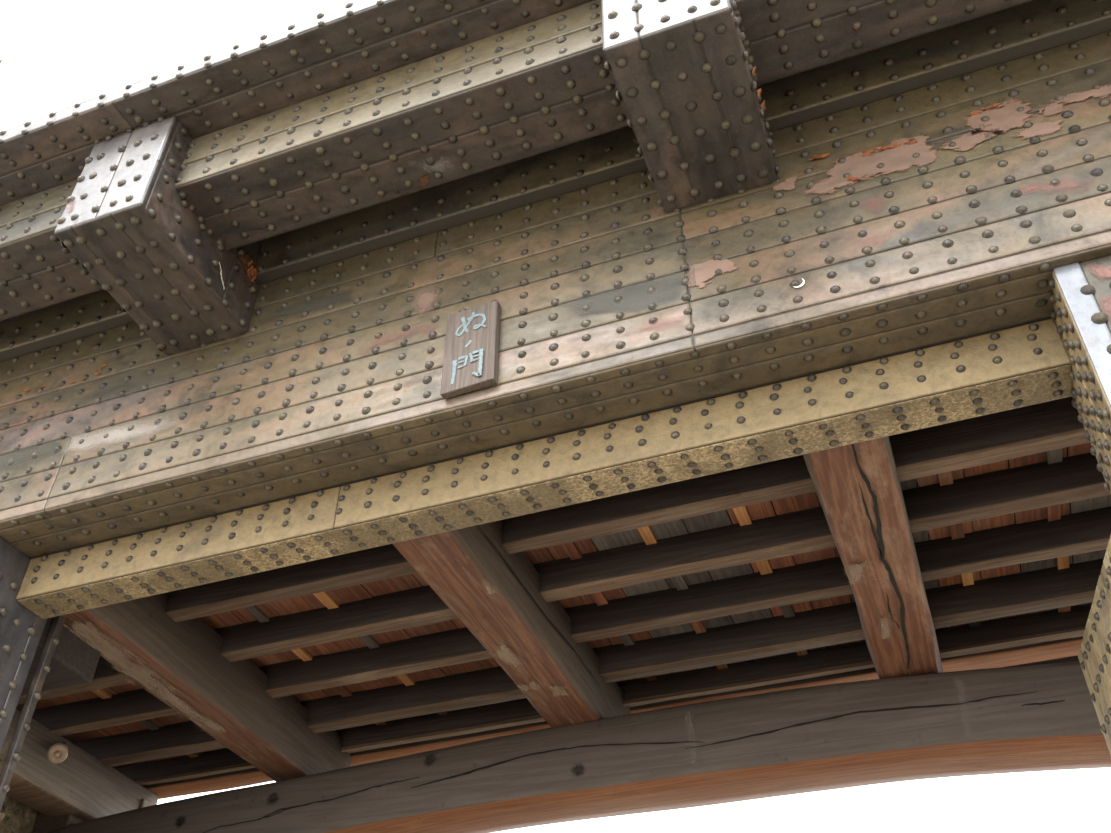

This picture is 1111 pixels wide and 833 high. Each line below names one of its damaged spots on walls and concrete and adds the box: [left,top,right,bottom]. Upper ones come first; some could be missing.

peeling [773,84,1111,197]
peeling [686,255,737,288]
crack [851,444,910,669]
crack [203,692,1065,833]